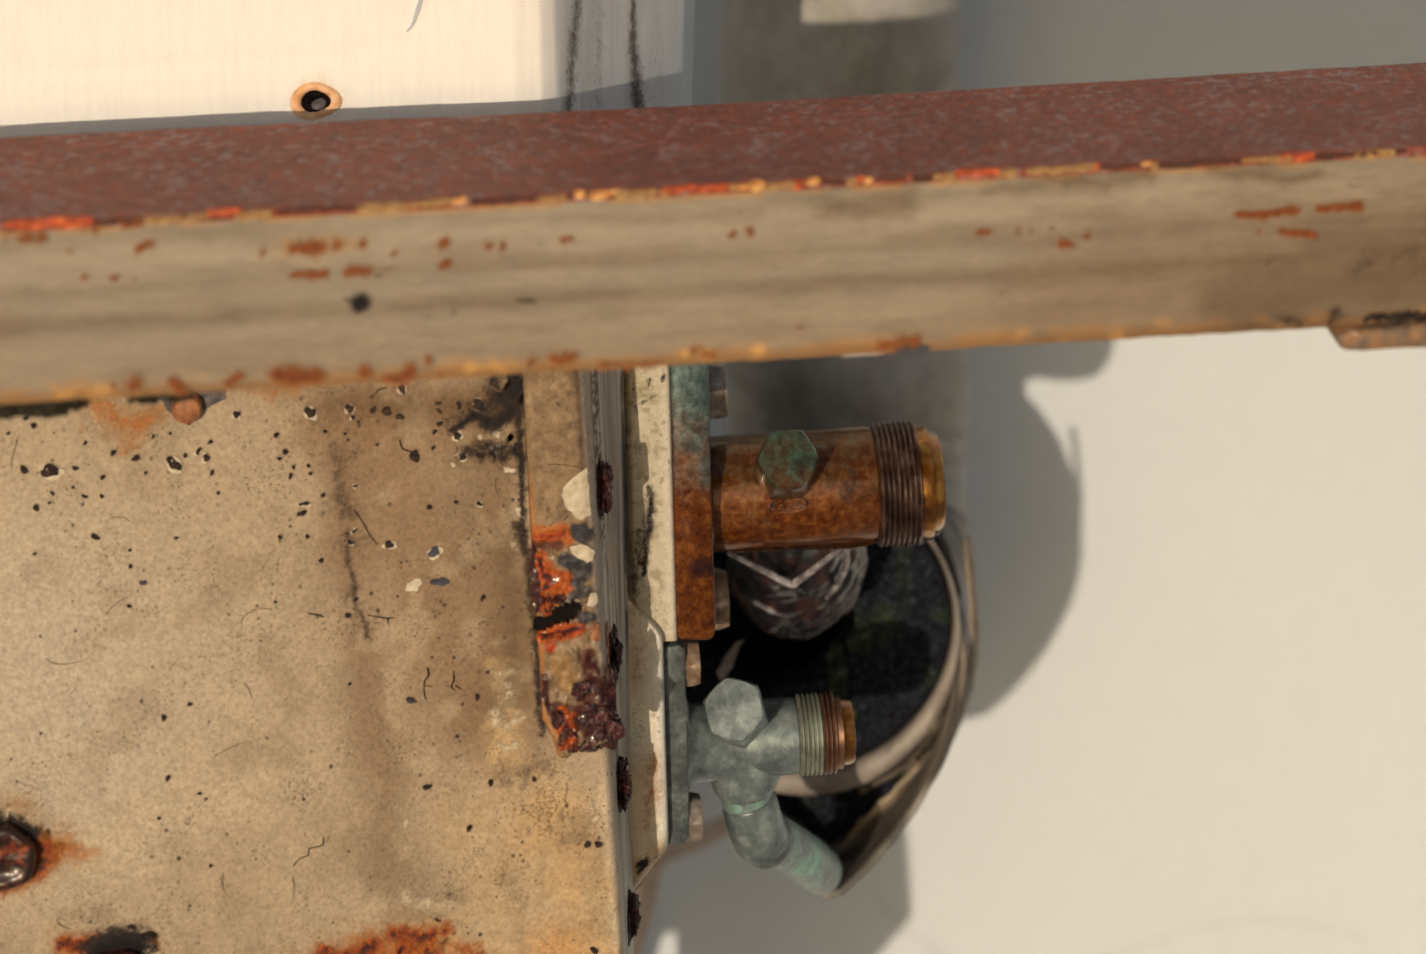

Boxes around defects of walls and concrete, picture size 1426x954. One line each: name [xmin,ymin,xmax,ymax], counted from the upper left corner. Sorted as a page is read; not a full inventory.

corrosion [120,219,154,254]
corrosion [283,238,399,280]
corrosion [438,235,453,271]
corrosion [1234,200,1363,239]
corrosion [224,365,326,396]
corrosion [357,355,441,386]
damp [447,373,546,737]
peeling [570,544,595,563]
peeling [586,592,601,642]
corrosion [2,832,94,896]
corrosion [55,934,97,954]
corrosion [316,921,484,954]